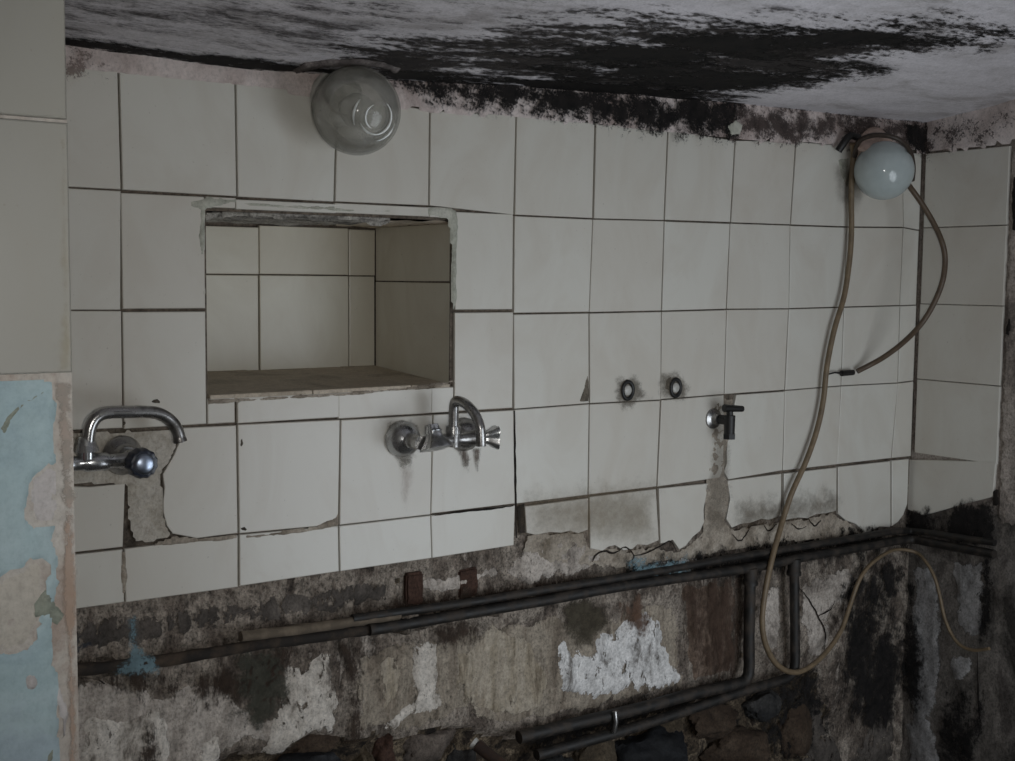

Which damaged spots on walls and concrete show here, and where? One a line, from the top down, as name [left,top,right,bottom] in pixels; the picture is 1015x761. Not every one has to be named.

water stain [65,0,1015,157]
water stain [110,670,178,761]
peeling [0,379,338,761]
water stain [339,641,364,745]
water stain [527,697,708,750]
spalling [423,398,861,592]
water stain [691,499,995,761]